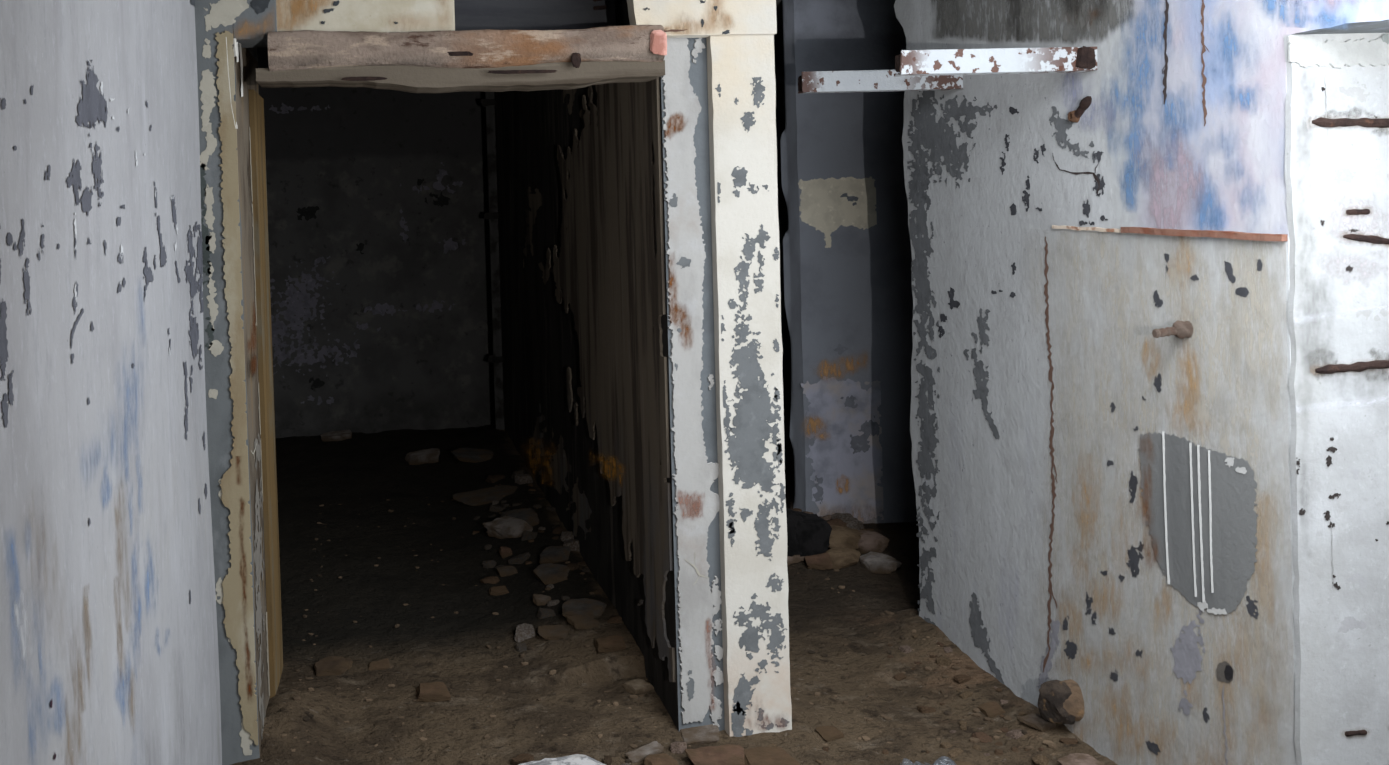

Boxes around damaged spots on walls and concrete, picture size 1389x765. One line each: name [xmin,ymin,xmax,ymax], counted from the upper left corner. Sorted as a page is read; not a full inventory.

peeling [0,60,148,428]
peeling [798,177,877,248]
peeling [1010,106,1108,226]
flaking render [143,0,270,756]
peeling [801,376,884,521]
peeling [907,90,1019,626]
peeling [969,592,1004,684]
peeling [1063,592,1116,659]
peeling [1100,426,1259,723]
peeling [1146,741,1160,755]